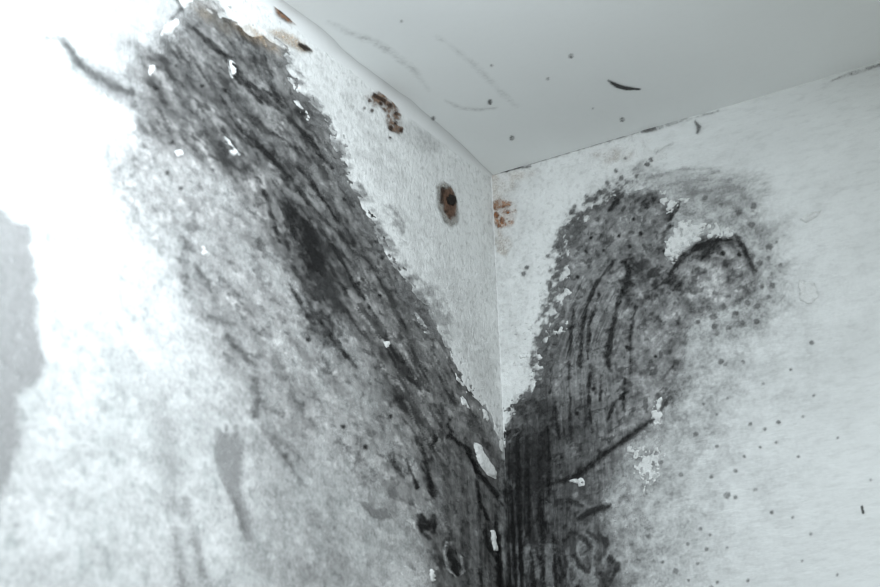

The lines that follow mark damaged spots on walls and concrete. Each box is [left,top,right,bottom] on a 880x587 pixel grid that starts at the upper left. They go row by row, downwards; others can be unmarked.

corrosion [364,92,404,139]
corrosion [437,183,459,226]
corrosion [493,199,513,227]
damp [108,0,777,587]